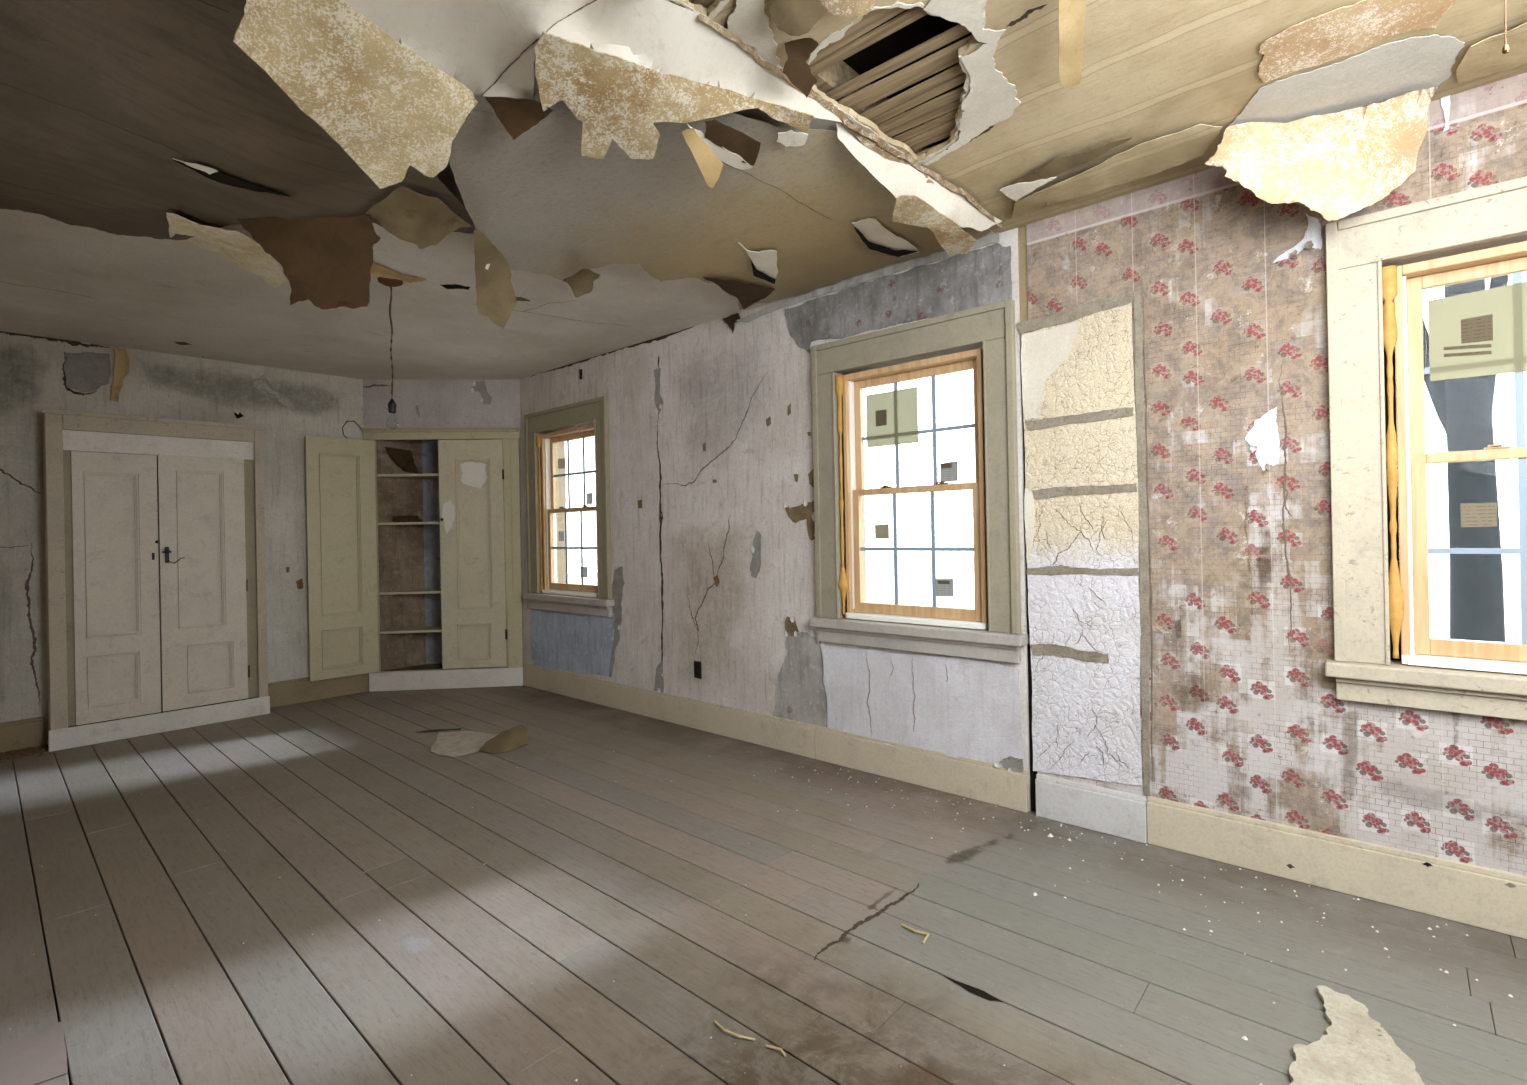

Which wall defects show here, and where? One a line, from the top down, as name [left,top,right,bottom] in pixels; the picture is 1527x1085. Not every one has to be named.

flaking render [666,0,780,65]
spalling [808,0,1021,166]
flaking render [1229,34,1465,126]
flaking render [62,352,111,396]
crack [0,469,43,494]
crack [657,377,764,666]
peeling [784,469,815,540]
crack [1016,290,1153,796]
crack [0,543,40,705]
peeling [609,566,625,677]
peeling [785,617,799,637]
flaking render [817,638,1024,772]